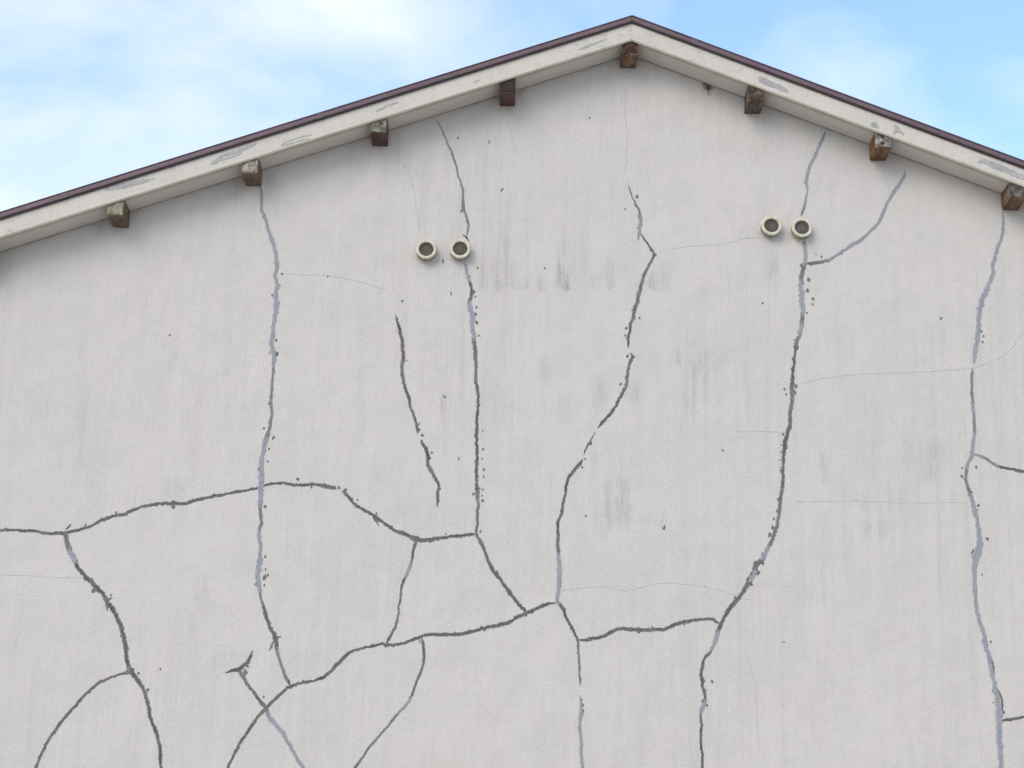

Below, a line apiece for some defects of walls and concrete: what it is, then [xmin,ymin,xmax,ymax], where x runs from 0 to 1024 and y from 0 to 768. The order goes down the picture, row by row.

crack [436,119,470,241]
crack [801,131,826,216]
crack [0,171,1024,768]